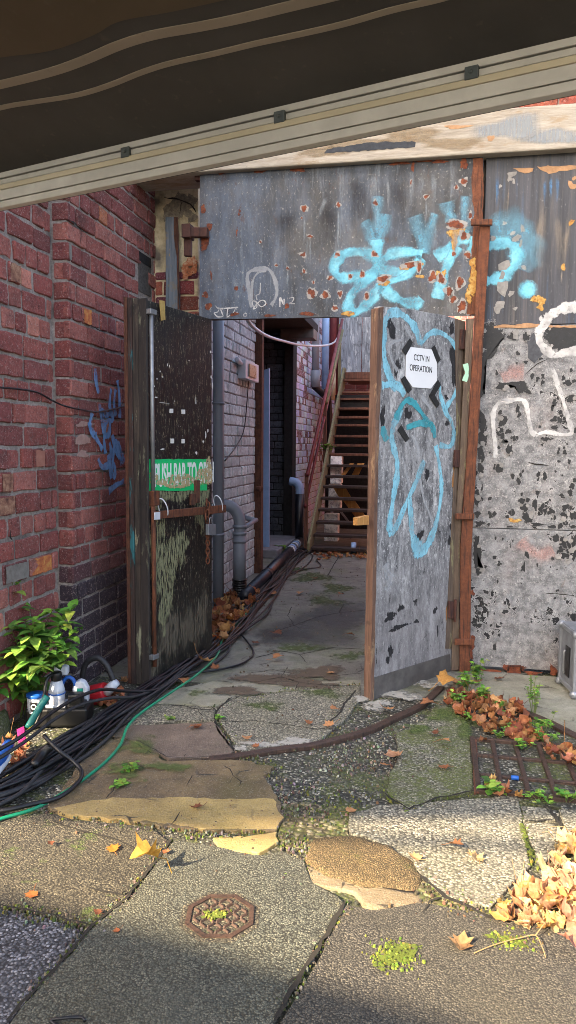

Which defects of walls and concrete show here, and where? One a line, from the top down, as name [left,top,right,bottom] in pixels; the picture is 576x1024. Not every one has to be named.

peeling [499,165,576,189]
rust [264,158,484,317]
peeling [502,221,525,247]
peeling [471,260,576,594]
peeling [471,603,510,651]